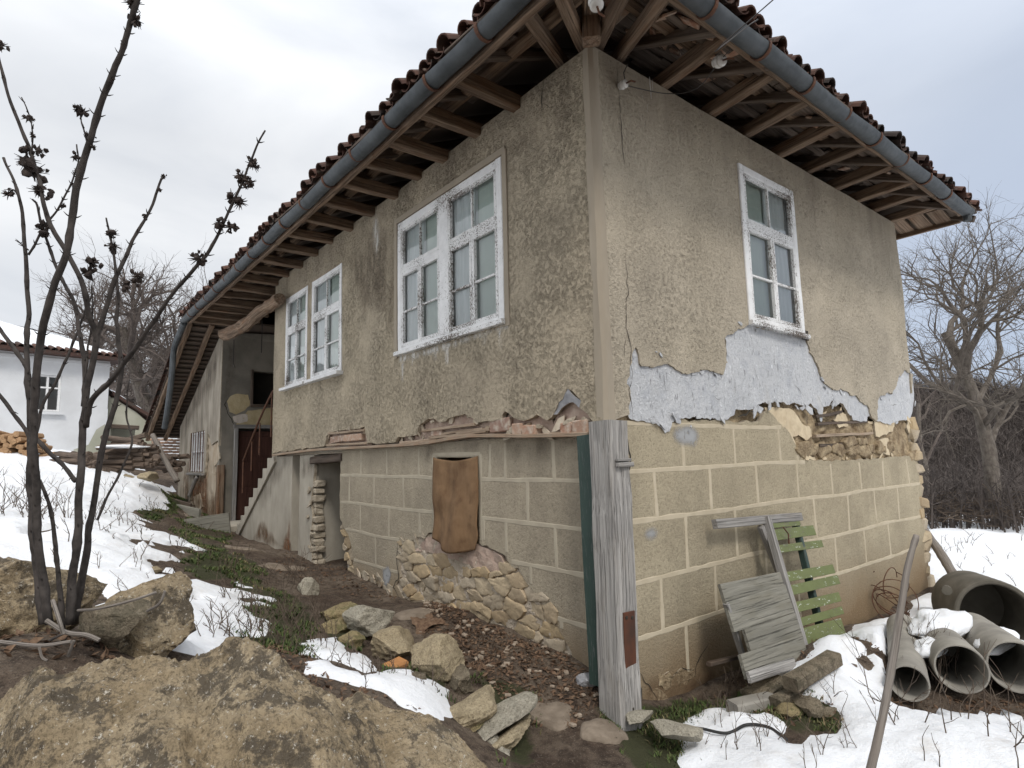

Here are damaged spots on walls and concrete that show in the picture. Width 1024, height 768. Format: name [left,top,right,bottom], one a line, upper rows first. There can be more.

spalling [326,426,375,447]
spalling [399,389,592,444]
crack [624,258,633,411]
peeling [627,321,918,464]